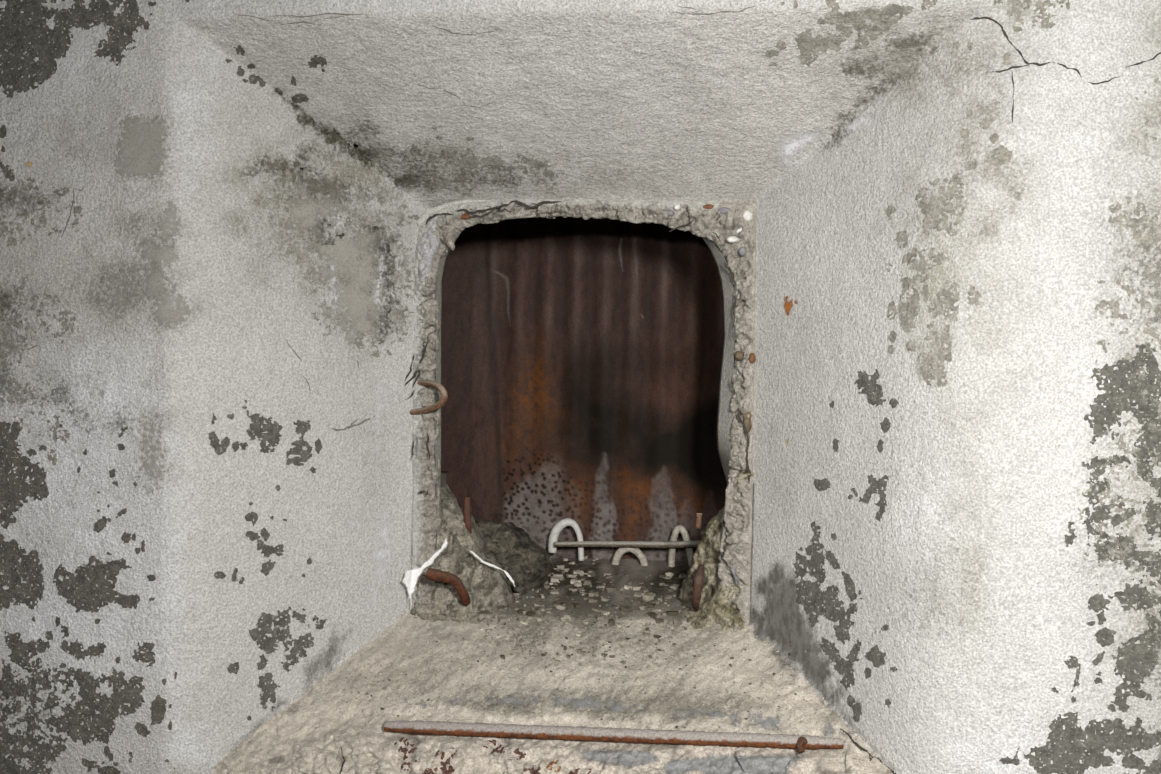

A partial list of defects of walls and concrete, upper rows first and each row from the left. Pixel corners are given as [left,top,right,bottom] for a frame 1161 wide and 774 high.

peeling [0,0,156,98]
crack [970,17,1161,122]
leakage [241,88,521,347]
peeling [0,274,155,624]
peeling [209,400,322,473]
spalling [280,172,757,632]
peeling [0,616,177,774]
peeling [249,606,327,712]
spalling [222,724,893,774]
corrosion [384,720,844,774]
leakage [755,566,834,699]
peeling [793,521,898,723]